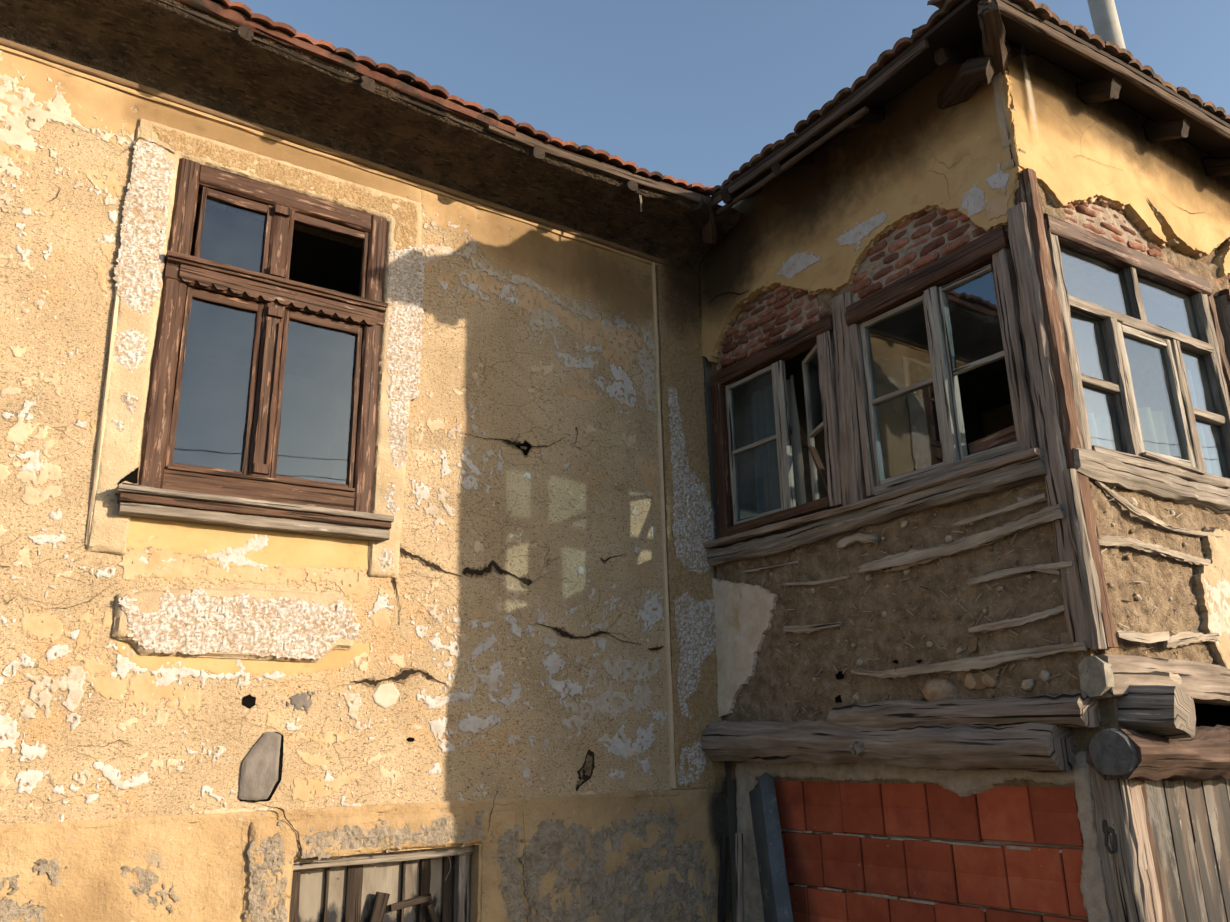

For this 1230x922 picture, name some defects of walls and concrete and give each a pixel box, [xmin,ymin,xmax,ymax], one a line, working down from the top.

peeling [954,163,1011,228]
crack [1147,194,1206,215]
spalling [113,327,149,374]
crack [462,427,602,485]
spalling [383,209,1098,722]
crack [392,547,555,625]
spalling [1089,479,1230,666]
spalling [0,348,719,922]
crack [536,623,664,651]
crack [327,665,446,691]